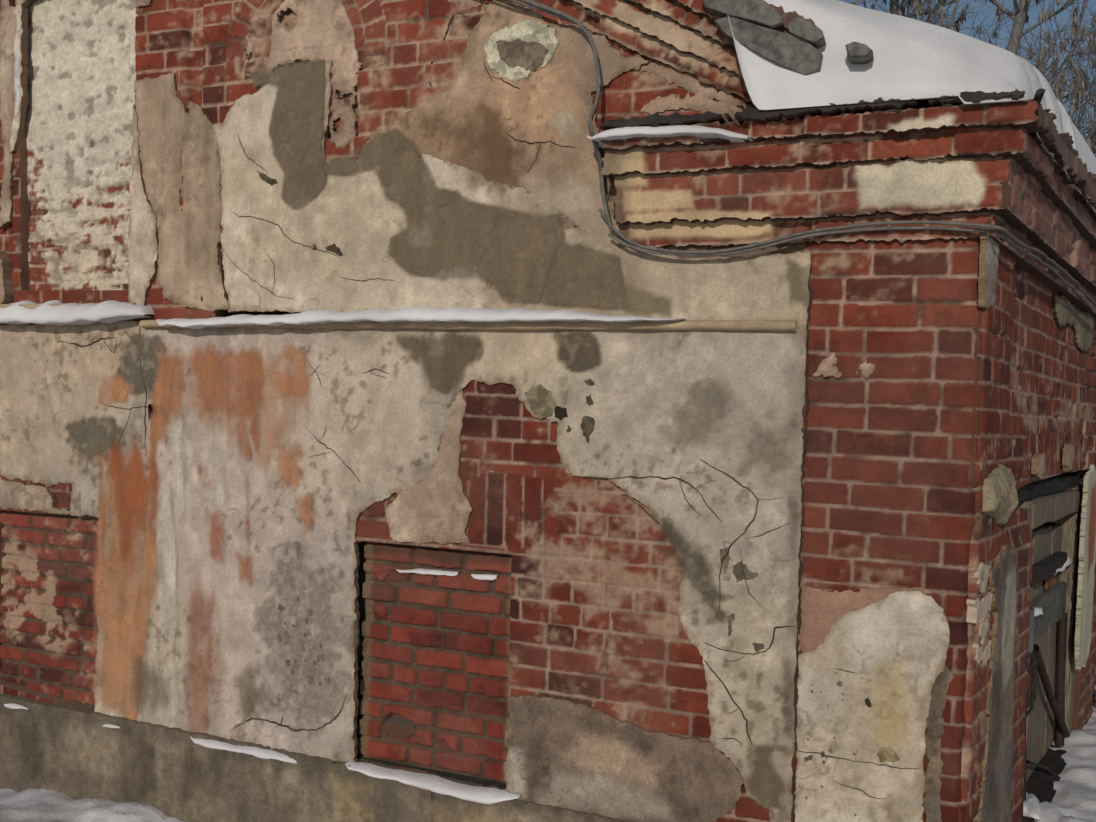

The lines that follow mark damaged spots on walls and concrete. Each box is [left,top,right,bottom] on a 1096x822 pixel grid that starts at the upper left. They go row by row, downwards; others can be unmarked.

peeling [135,0,492,160]
peeling [592,36,756,131]
peeling [0,107,129,304]
leakage [251,59,669,315]
rust [193,347,308,487]
leakage [397,334,482,393]
leakage [558,332,600,371]
rust [95,358,181,720]
rust [210,515,222,557]
peeling [356,378,711,741]
crack [579,262,918,822]
crack [233,697,346,732]